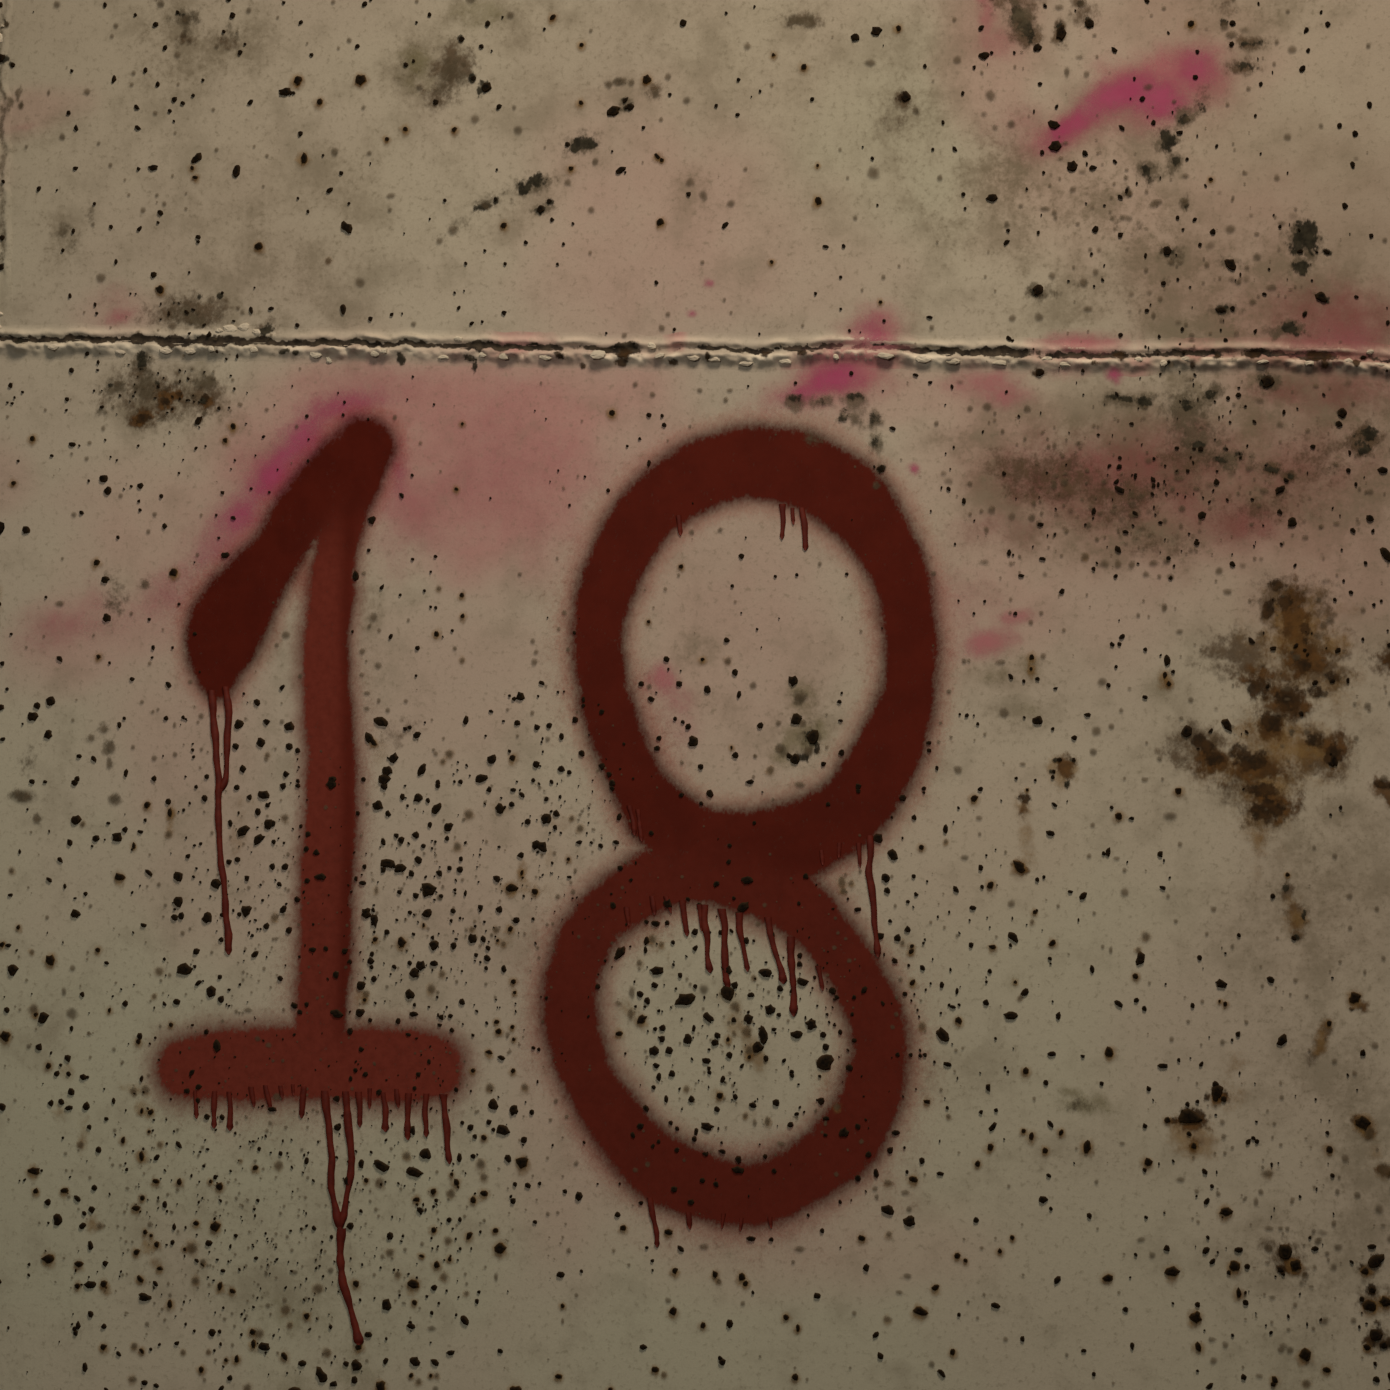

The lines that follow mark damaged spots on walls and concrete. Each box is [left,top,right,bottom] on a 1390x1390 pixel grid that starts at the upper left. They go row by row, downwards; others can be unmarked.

rust [103,1,191,56]
rust [955,18,1042,98]
leakage [994,0,1091,47]
leakage [1231,36,1263,72]
rust [1247,10,1330,90]
rust [112,67,215,133]
leakage [1137,103,1206,182]
rust [98,142,198,232]
leakage [1285,219,1332,275]
rust [362,549,465,661]
rust [1087,842,1181,897]
rust [1102,1211,1170,1312]